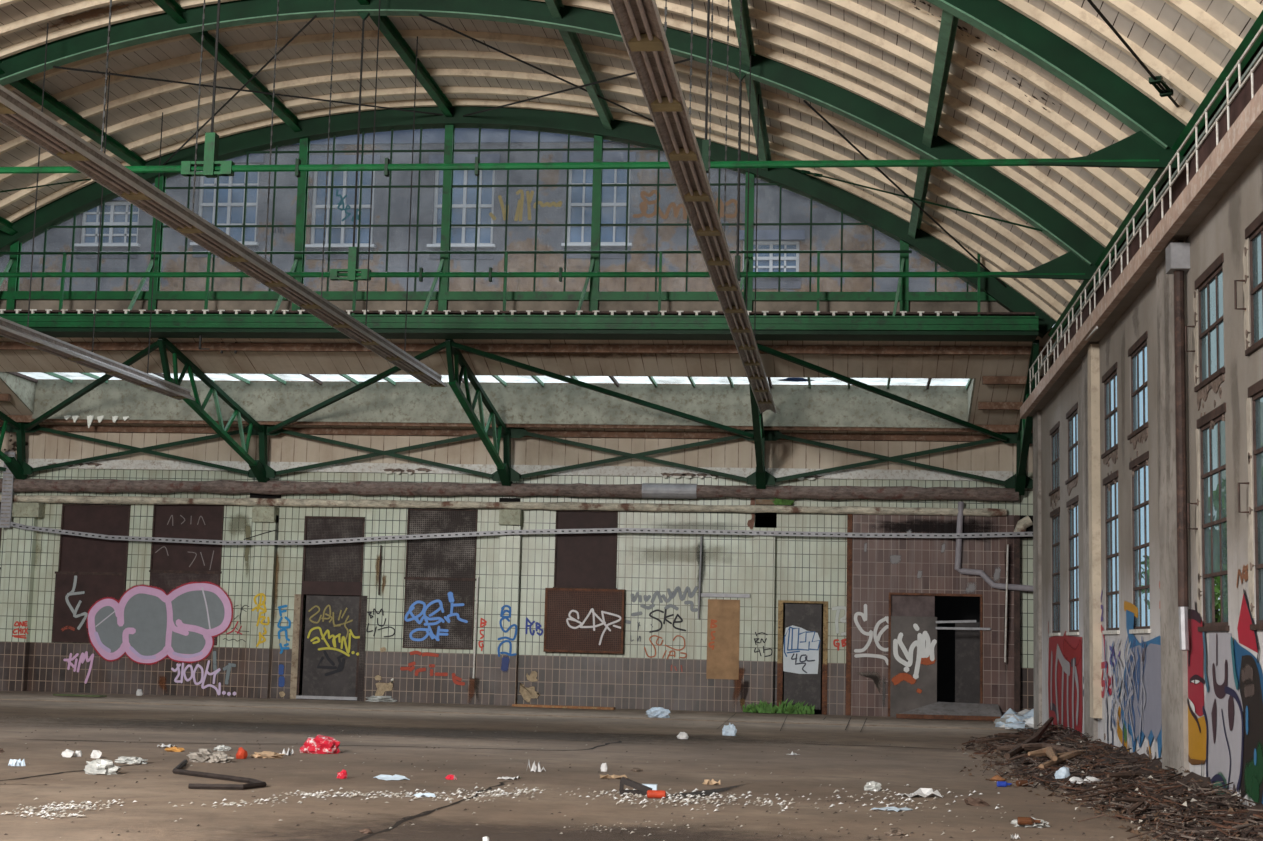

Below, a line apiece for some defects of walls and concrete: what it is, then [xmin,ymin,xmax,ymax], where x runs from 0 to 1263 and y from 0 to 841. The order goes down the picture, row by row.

crack [0,740,165,785]
crack [478,741,622,751]